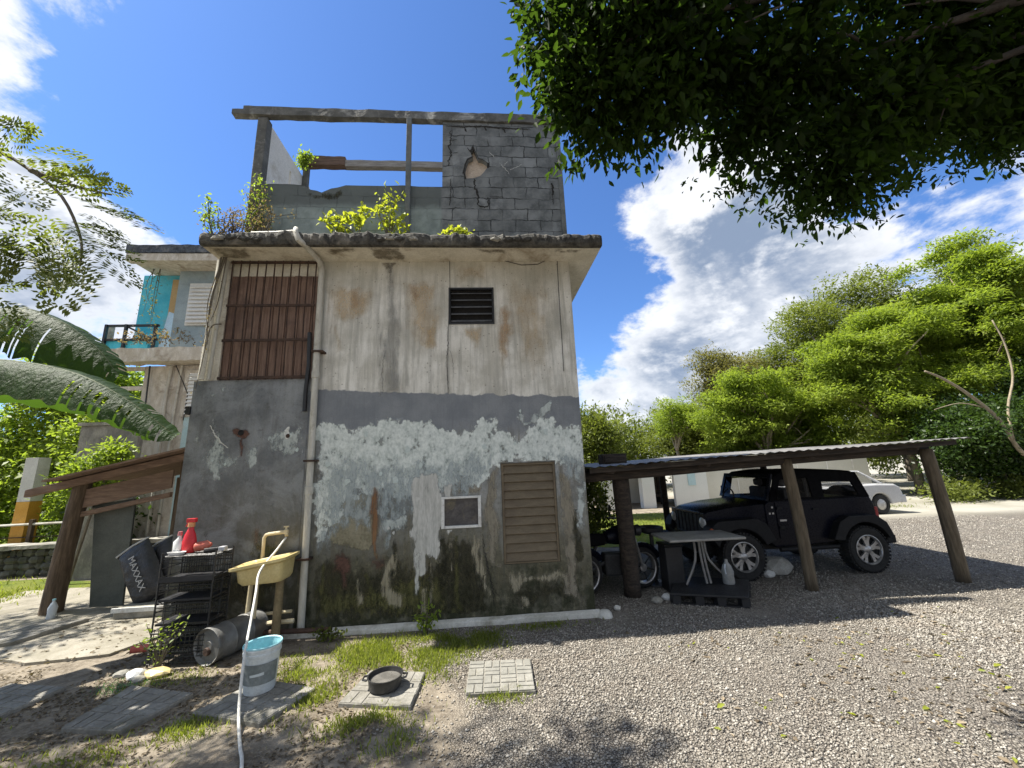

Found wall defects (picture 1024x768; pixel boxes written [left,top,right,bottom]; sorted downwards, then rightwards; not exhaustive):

spalling [462,146,489,179]
crack [447,125,528,208]
peeling [207,425,257,480]
peeling [268,427,303,455]
rust [370,488,378,555]
peeling [312,401,586,596]
water stain [573,509,584,562]
water stain [314,530,491,621]
water stain [509,570,576,606]